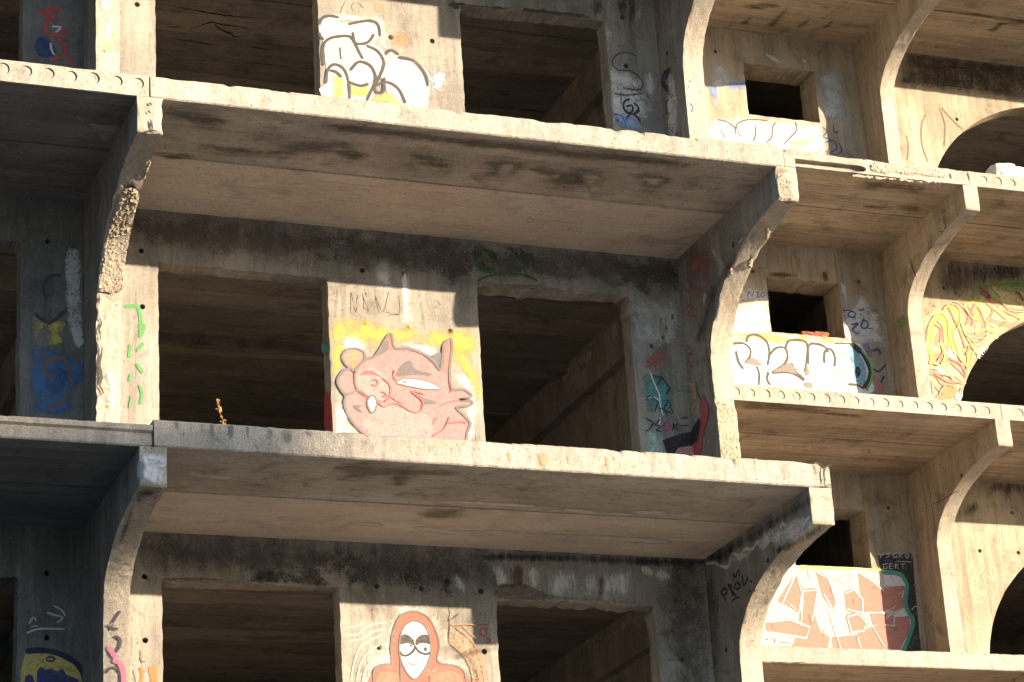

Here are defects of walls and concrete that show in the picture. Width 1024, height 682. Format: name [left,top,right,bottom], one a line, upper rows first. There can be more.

mould [902,54,1024,97]
damp [163,107,225,128]
damp [274,125,687,184]
spalling [853,161,952,183]
spalling [98,162,151,294]
damp [134,216,678,318]
damp [337,463,455,486]
damp [120,497,821,682]